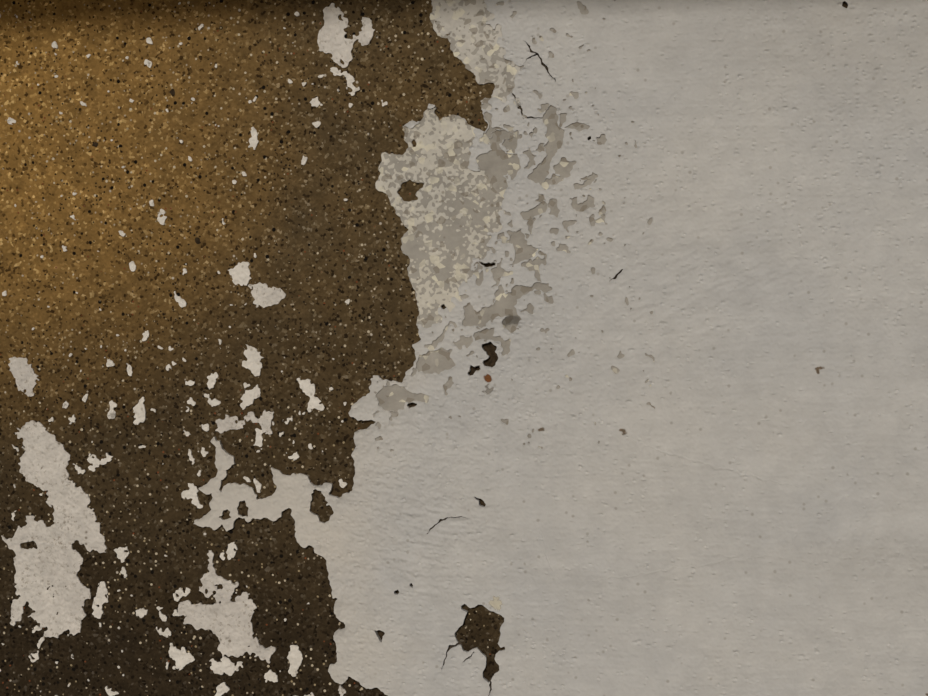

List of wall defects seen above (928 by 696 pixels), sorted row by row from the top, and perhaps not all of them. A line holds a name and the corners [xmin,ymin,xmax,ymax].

peeling [0,0,613,696]